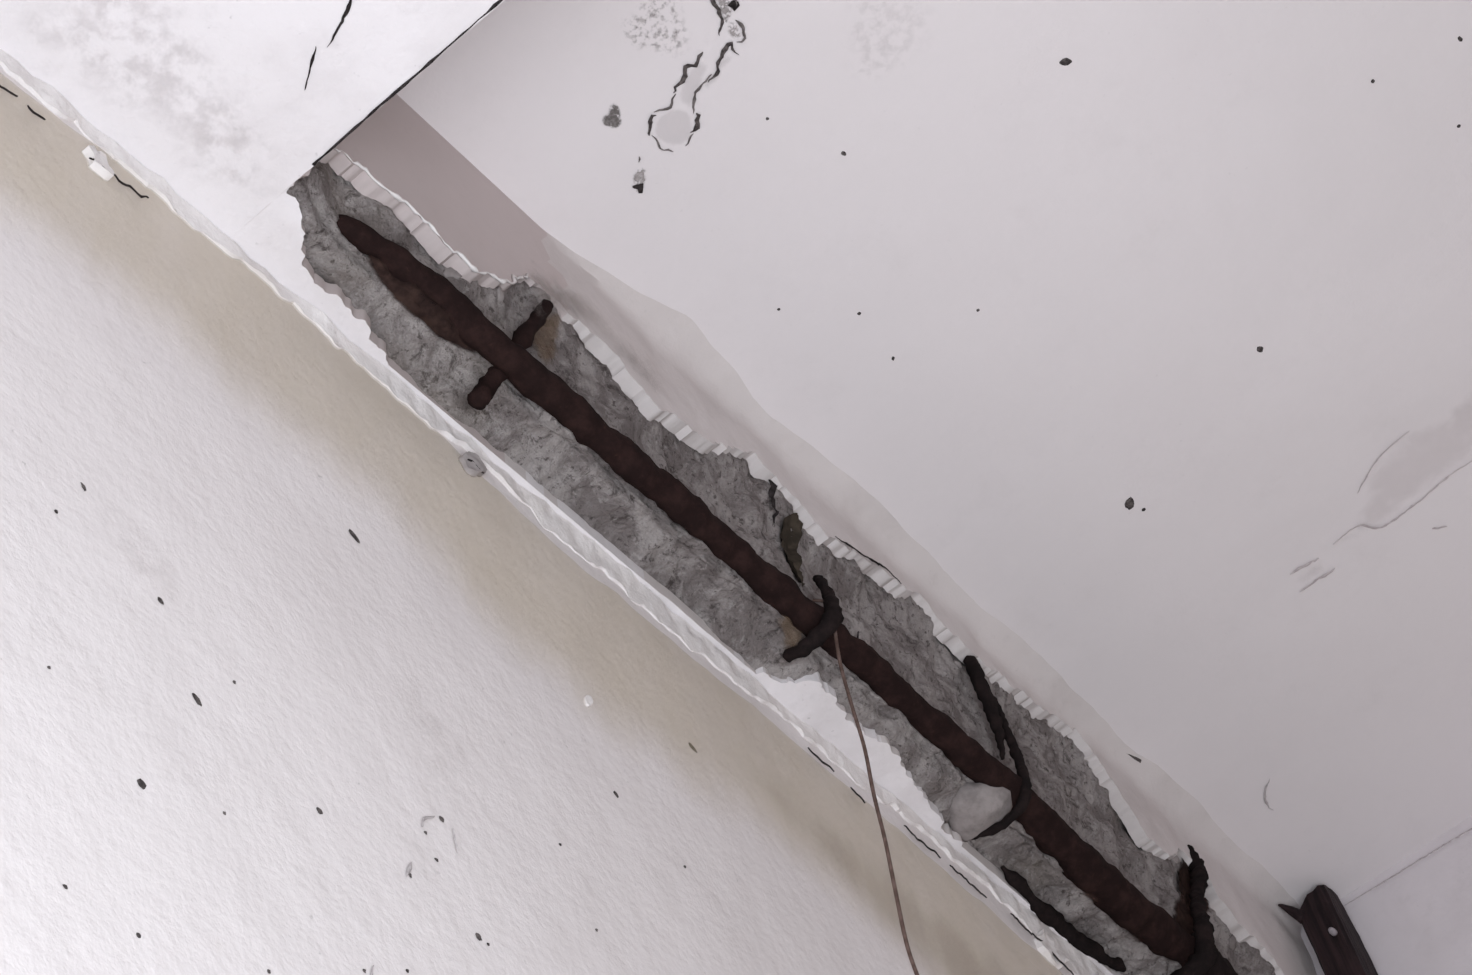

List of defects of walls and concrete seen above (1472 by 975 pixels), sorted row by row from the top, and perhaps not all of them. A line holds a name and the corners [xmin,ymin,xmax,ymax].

crack [305,0,503,166]
peeling [648,0,746,152]
corrosion [368,254,477,352]
corrosion [534,316,558,359]
spalling [0,49,1182,975]
corrosion [783,616,801,648]
corrosion [1173,859,1209,935]
spalling [1207,907,1276,975]